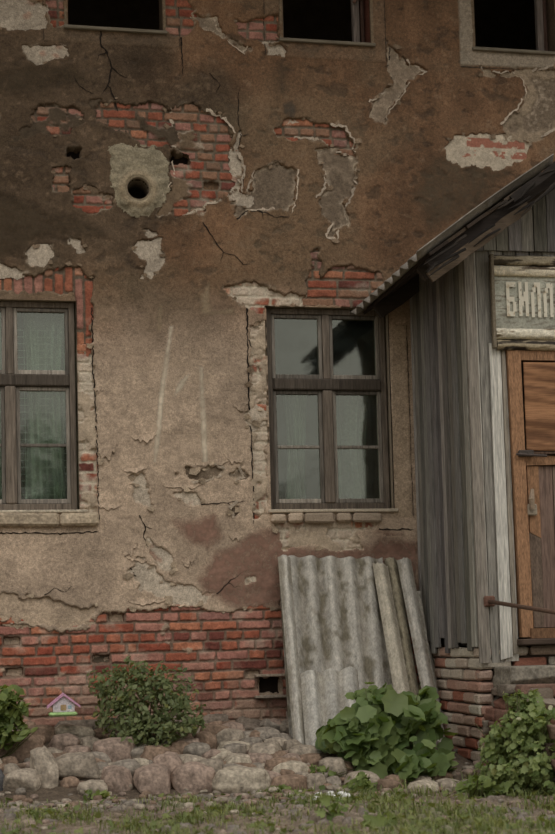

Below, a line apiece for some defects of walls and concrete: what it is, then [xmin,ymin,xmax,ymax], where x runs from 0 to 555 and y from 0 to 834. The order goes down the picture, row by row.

peeling [0,0,49,31]
crack [75,31,127,111]
spalling [12,97,299,218]
peeling [274,117,362,243]
peeling [369,42,428,123]
peeling [445,64,555,171]
spalling [0,238,105,513]
spalling [173,249,383,552]
spalling [0,537,287,727]
spalling [405,609,421,690]